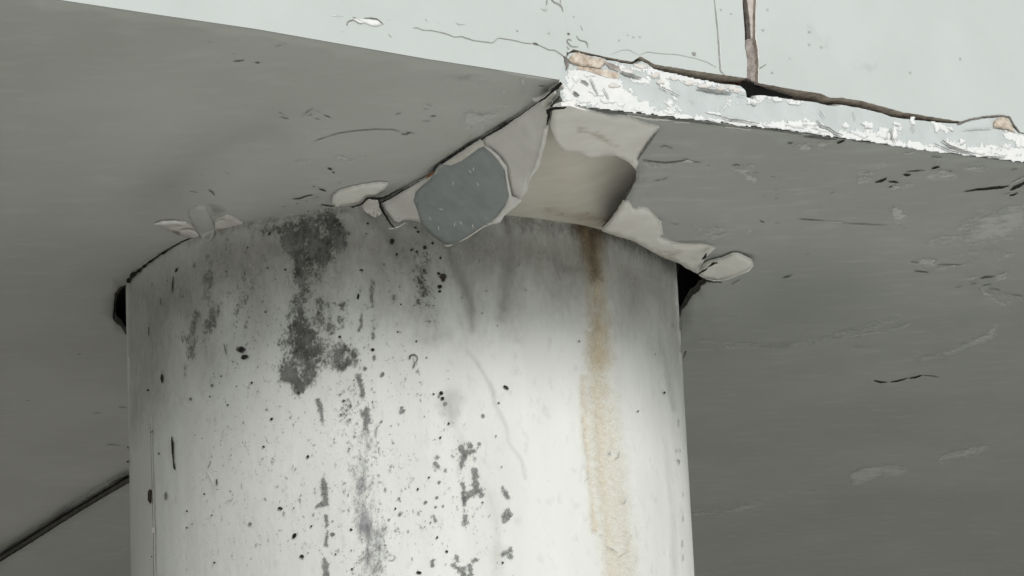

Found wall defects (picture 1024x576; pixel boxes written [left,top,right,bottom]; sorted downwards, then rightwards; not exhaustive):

peeling [333,15,393,37]
crack [282,0,588,229]
crack [957,115,1020,132]
peeling [332,52,1024,281]
peeling [153,220,199,238]
corrosion [577,224,600,298]
damp [153,210,603,576]
crack [875,375,939,383]